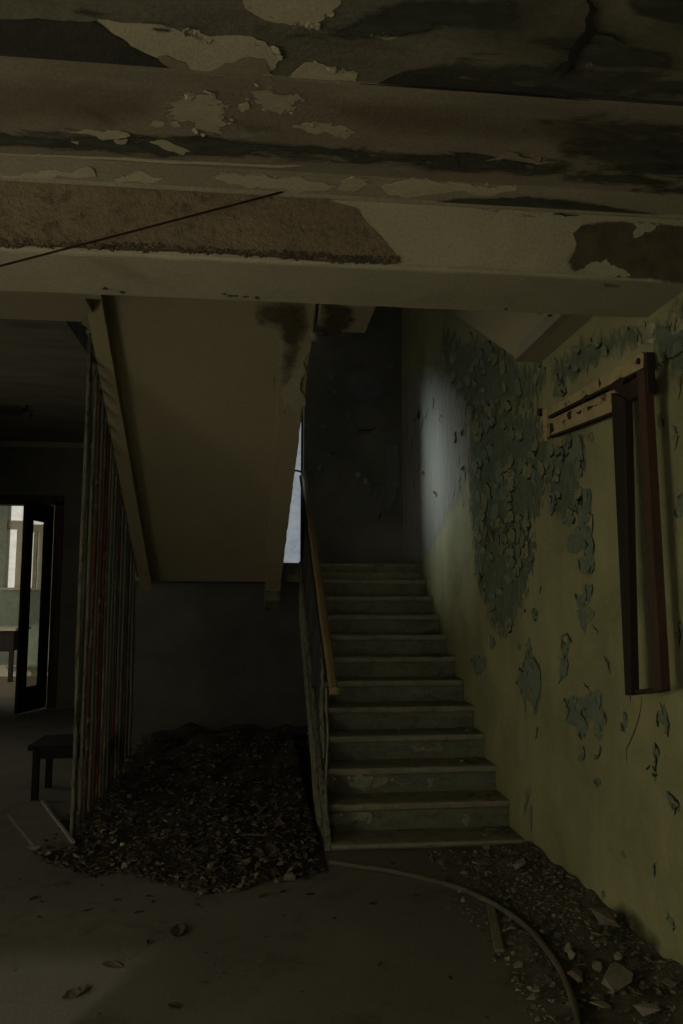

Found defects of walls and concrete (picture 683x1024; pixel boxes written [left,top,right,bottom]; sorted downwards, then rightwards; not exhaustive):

peeling [243,0,341,31]
crack [360,0,627,101]
flaking render [0,18,582,272]
peeling [585,259,630,277]
water stain [257,304,306,369]
peeling [545,432,598,633]
peeling [472,518,542,650]
peeling [515,636,542,739]
peeling [563,682,607,762]